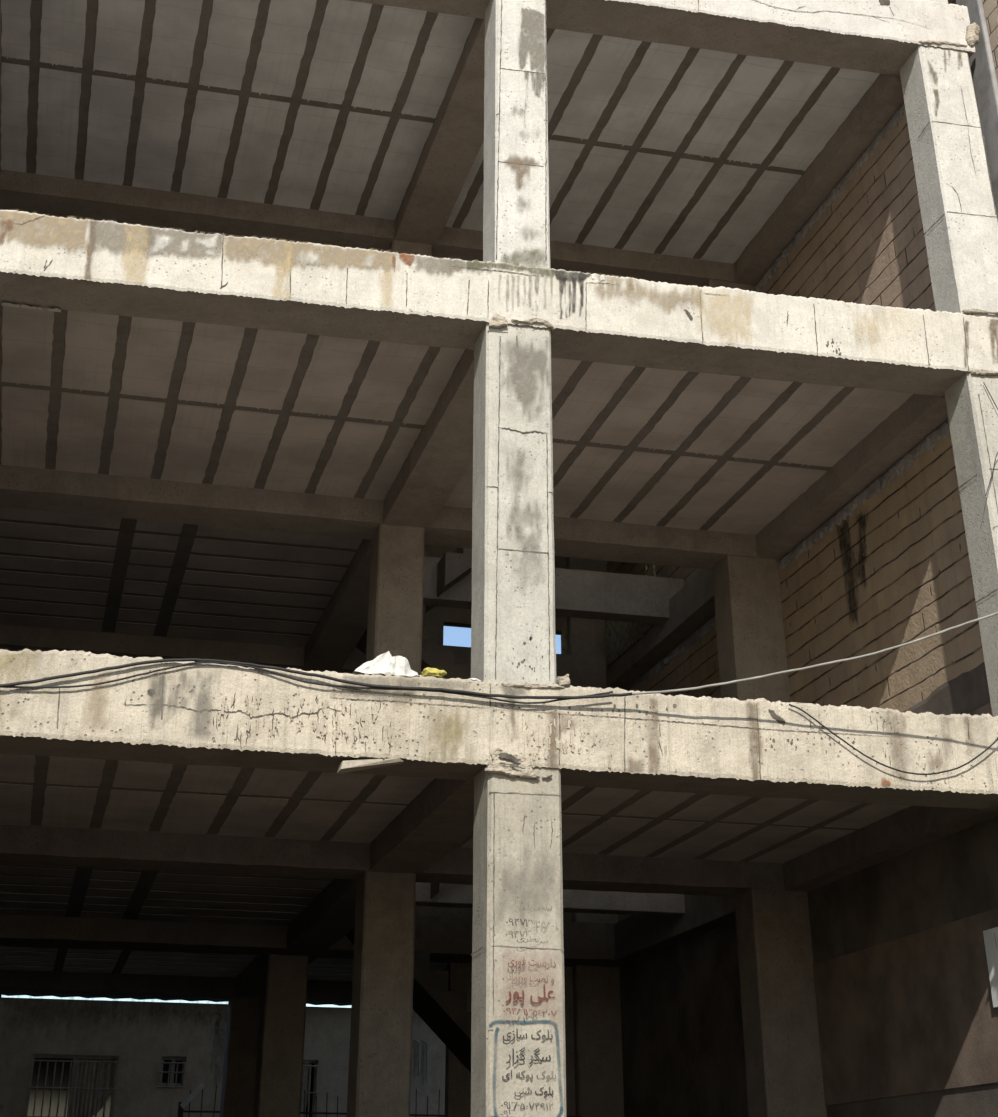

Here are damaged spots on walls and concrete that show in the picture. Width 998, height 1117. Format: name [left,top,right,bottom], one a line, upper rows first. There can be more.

water stain [519,8,545,97]
water stain [504,251,541,265]
water stain [535,269,632,318]
water stain [990,319,998,356]
water stain [510,345,548,406]
crack [124,692,952,783]